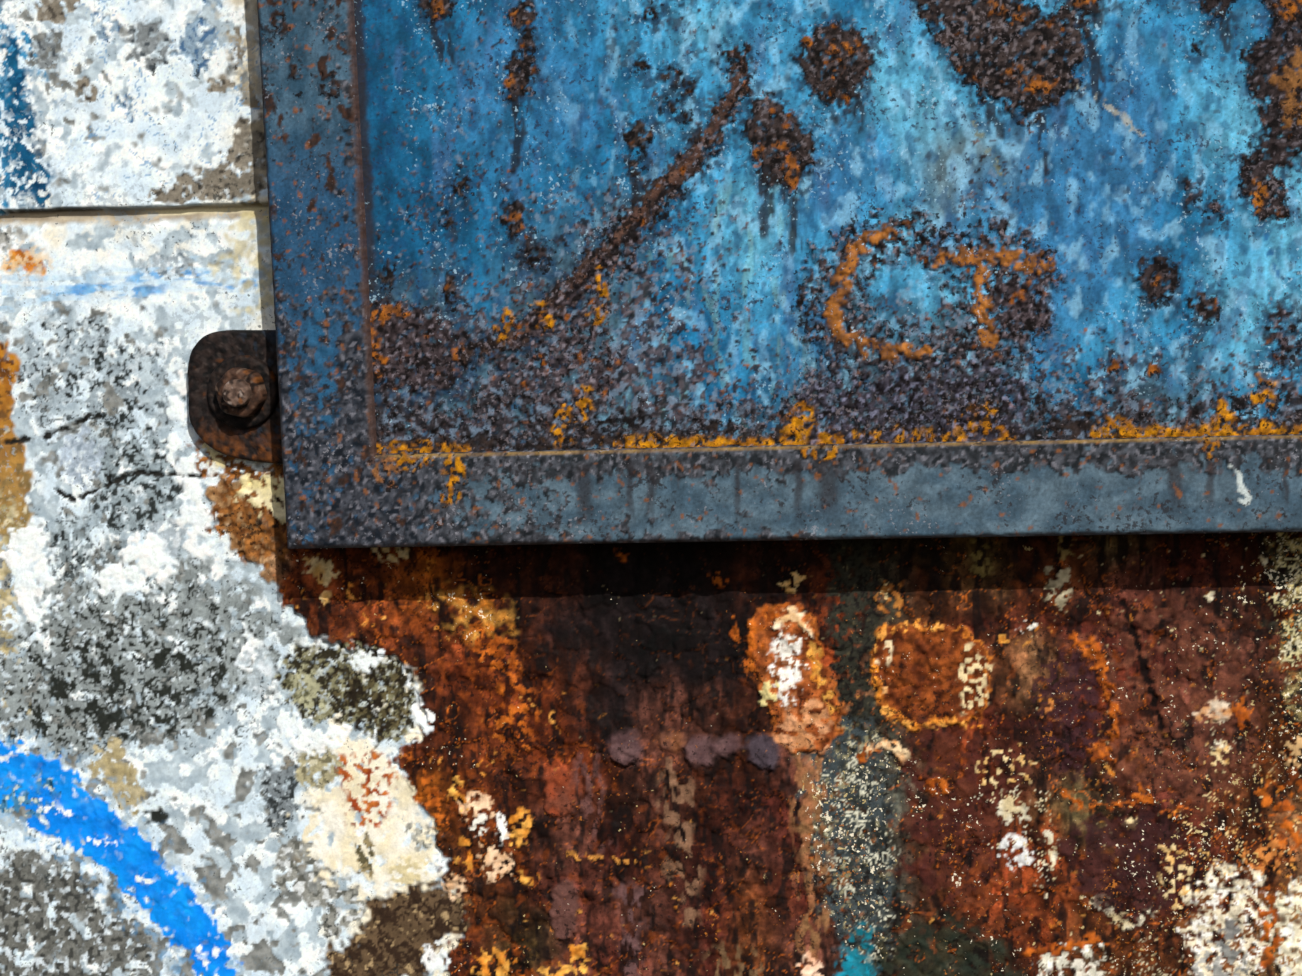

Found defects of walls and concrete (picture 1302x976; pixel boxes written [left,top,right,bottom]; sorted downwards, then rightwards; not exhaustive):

corrosion [261,3,340,99]
corrosion [368,0,1302,454]
crack [2,410,103,446]
crack [52,461,201,504]
corrosion [183,420,1302,976]